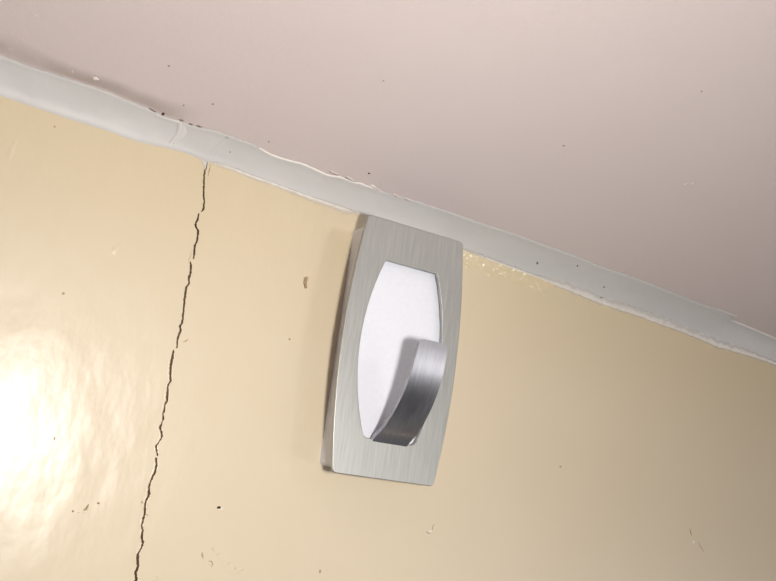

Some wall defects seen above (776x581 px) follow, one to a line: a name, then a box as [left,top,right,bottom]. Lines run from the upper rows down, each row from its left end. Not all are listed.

crack [132,160,211,581]